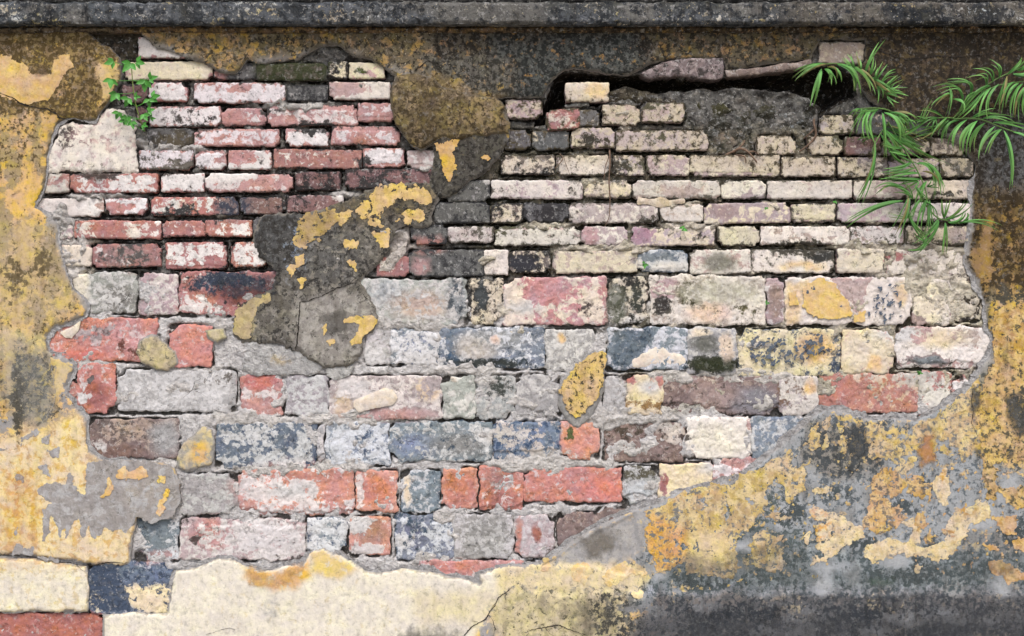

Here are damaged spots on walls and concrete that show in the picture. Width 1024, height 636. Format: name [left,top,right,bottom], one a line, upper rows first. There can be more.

peeling [726,112,754,147]
peeling [434,139,460,182]
peeling [287,254,305,277]
peeling [336,239,359,272]
peeling [371,228,390,248]
peeling [402,208,425,225]
peeling [20,428,60,458]
peeling [864,303,1024,564]
peeling [803,383,981,566]
peeling [744,530,791,581]
peeling [977,527,1024,585]
crack [464,588,511,636]